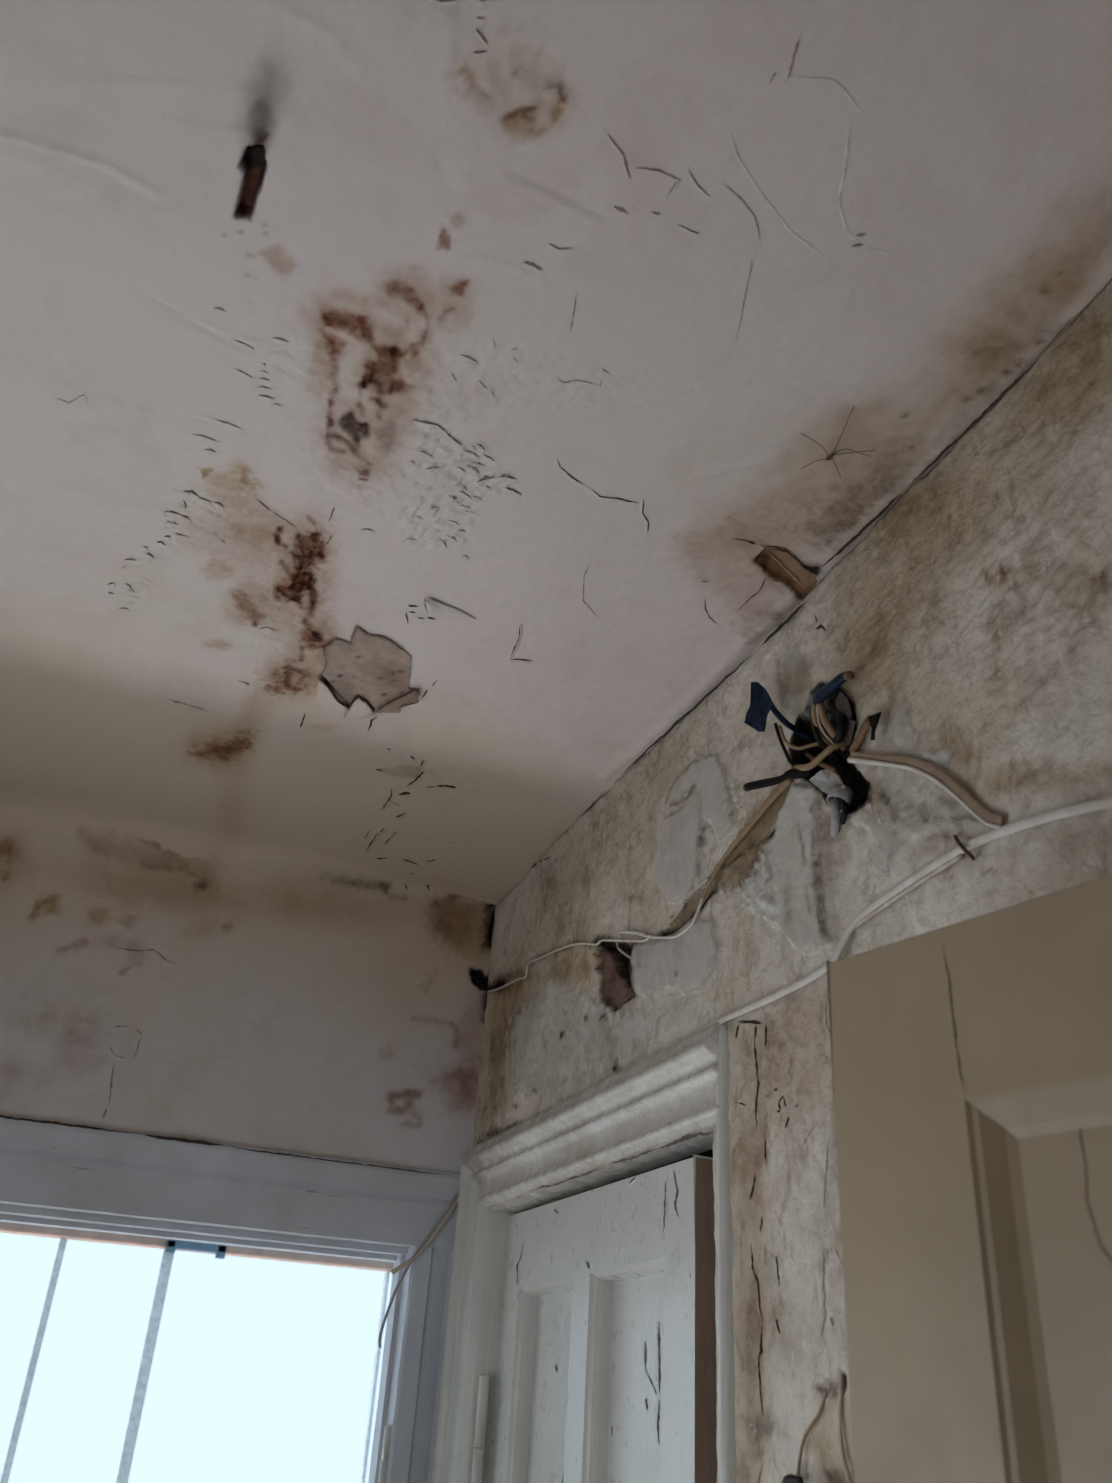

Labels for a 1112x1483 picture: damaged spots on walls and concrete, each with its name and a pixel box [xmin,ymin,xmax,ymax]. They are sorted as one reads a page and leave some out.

crack [769,36,801,84]
crack [852,233,866,247]
crack [823,279,1112,566]
flaking render [754,542,819,600]
peeling [315,627,419,718]
crack [531,601,826,868]
crack [365,716,456,890]
flaking render [595,938,637,1011]
crack [736,1020,828,1412]
crack [816,1246,843,1345]